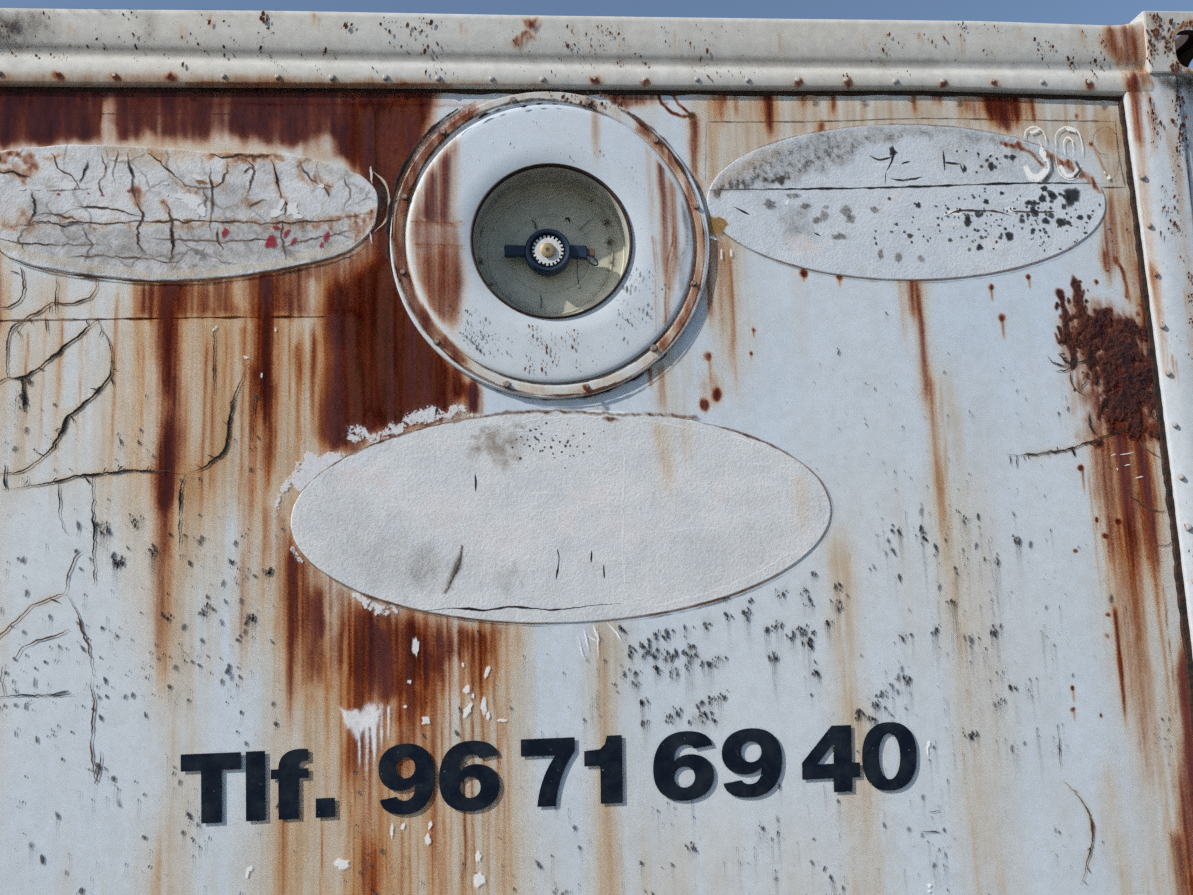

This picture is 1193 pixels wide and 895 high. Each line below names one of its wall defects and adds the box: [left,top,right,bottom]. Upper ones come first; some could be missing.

crack [0,267,258,781]
rust [141,278,232,611]
rust [0,72,479,462]
rust [285,546,492,822]
spalling [445,545,463,592]
rust [608,81,698,261]
rust [969,81,1035,130]
crack [1057,727,1094,885]
crack [1008,352,1159,466]
rust [1055,200,1160,568]
rust [1106,596,1125,713]
rust [1172,650,1193,893]